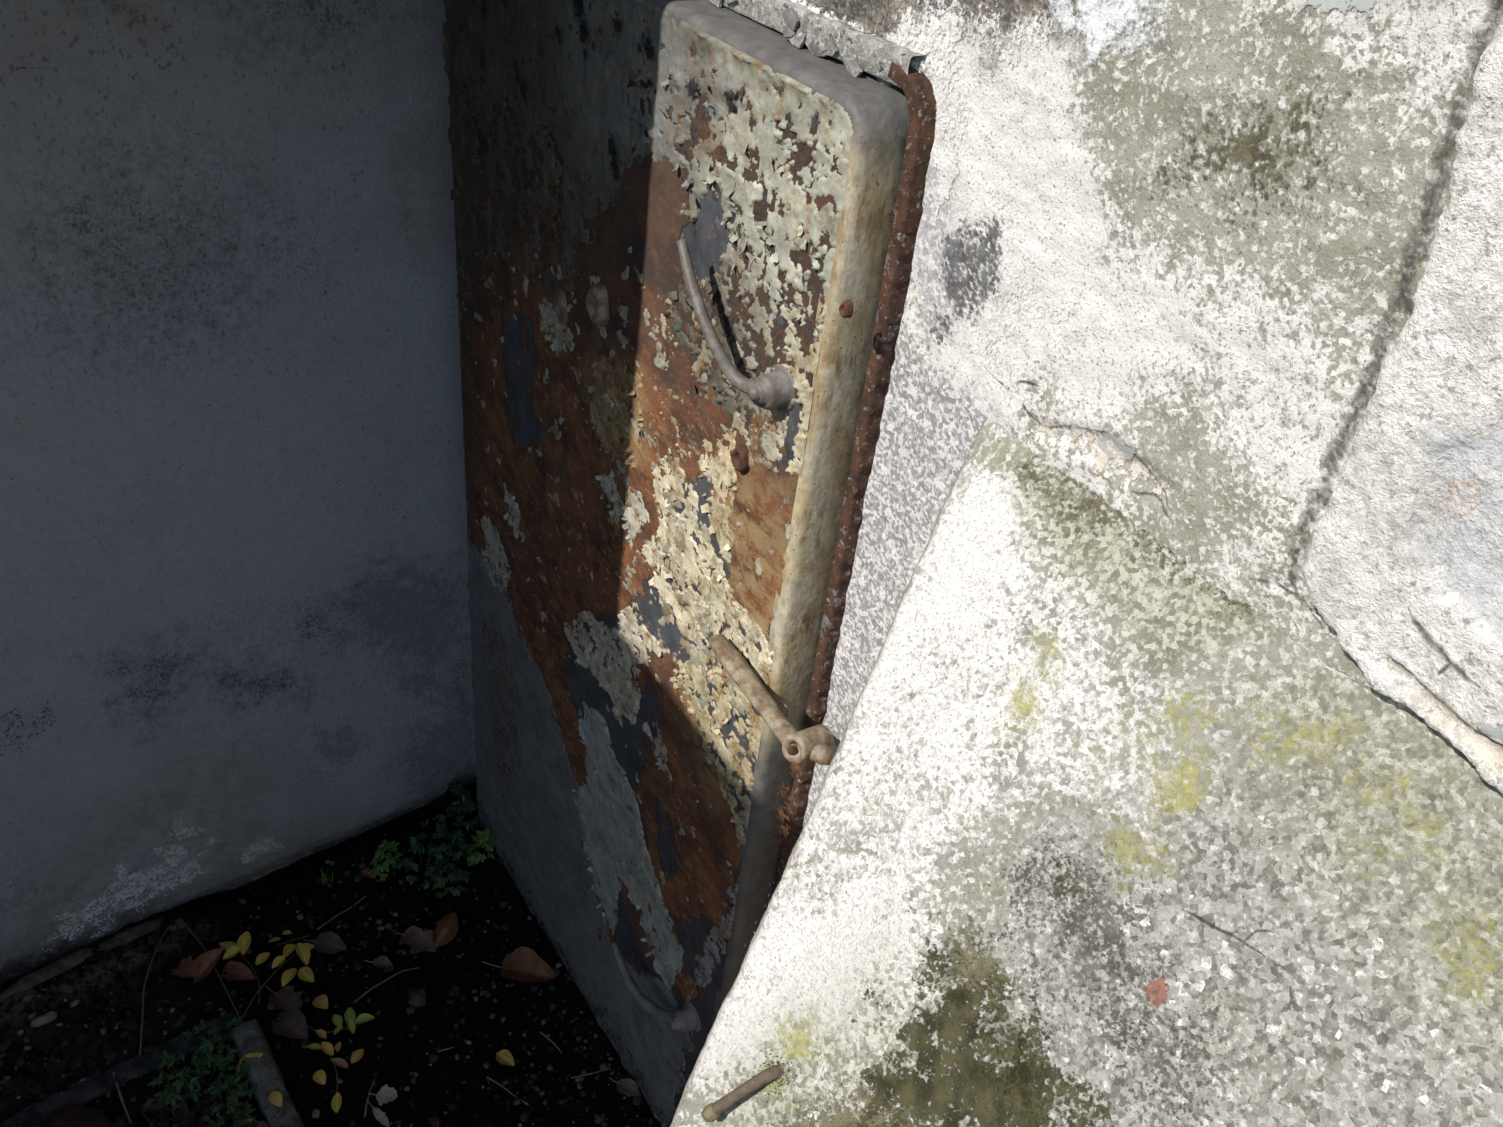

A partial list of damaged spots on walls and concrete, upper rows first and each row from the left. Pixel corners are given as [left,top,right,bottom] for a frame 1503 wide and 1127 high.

peeling [909,58,930,73]
leakage [813,0,1084,415]
leakage [1129,73,1367,231]
peeling [443,0,853,1127]
corrosion [459,15,842,786]
corrosion [595,645,745,1007]
leakage [938,910,1096,1127]